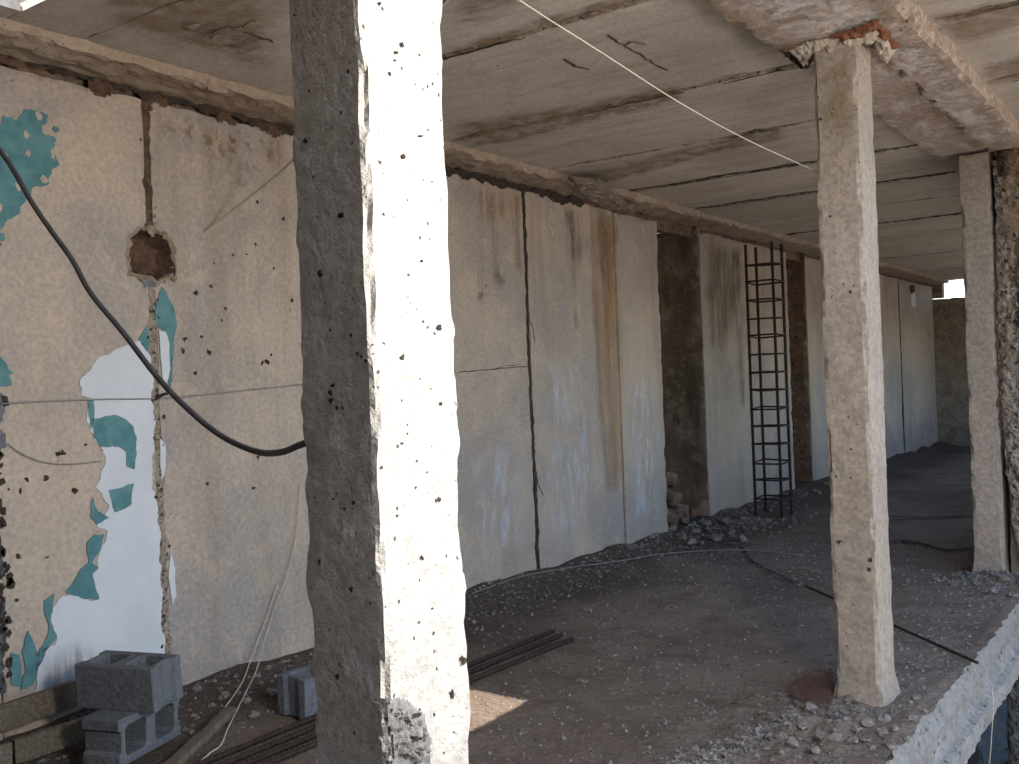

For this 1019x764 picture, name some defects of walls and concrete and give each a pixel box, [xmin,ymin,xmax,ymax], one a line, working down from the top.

crack [0,54,294,138]
crack [442,0,799,141]
crack [874,144,918,154]
crack [876,171,958,185]
crack [878,213,962,224]
crack [445,119,818,569]
spalling [990,147,1019,559]
flaking render [0,99,187,693]
crack [688,542,795,583]
spalling [373,697,432,764]
spalling [1003,676,1019,764]